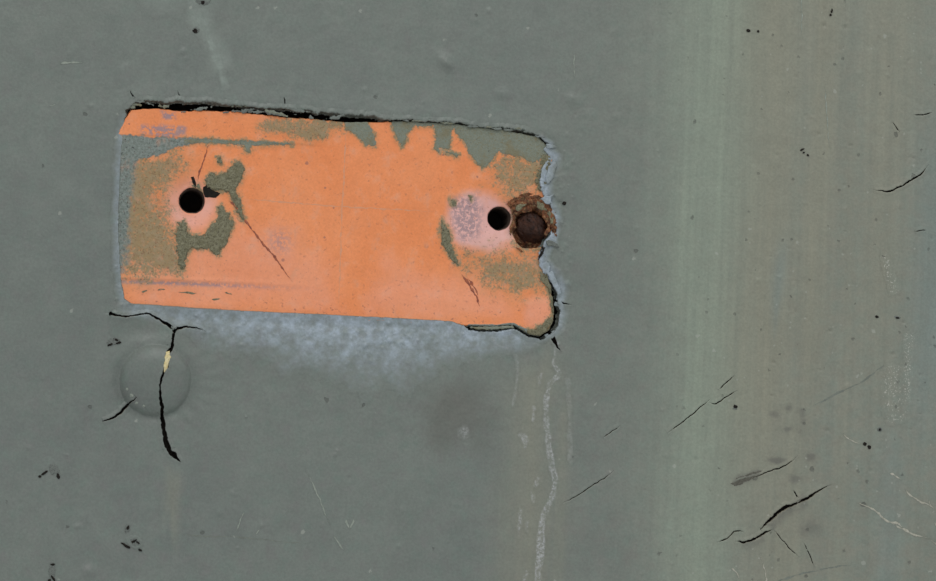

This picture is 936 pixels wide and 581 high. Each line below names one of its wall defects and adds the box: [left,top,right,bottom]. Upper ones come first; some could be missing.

peeling [118,97,566,337]
crack [874,162,931,196]
crack [890,109,933,134]
crack [102,309,207,464]
leakage [109,110,574,581]
crack [666,372,739,436]
crack [561,468,616,506]
crack [717,453,832,569]